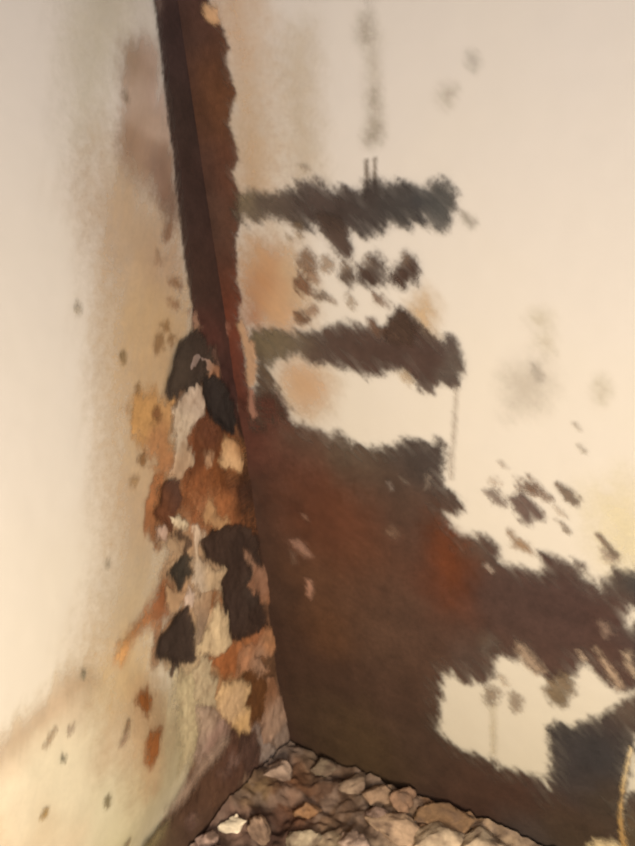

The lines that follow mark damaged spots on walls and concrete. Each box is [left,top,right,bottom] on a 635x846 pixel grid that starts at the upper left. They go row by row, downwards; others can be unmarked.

damp [147,730,262,846]
spalling [144,313,290,827]
damp [102,0,465,761]
damp [237,395,635,846]